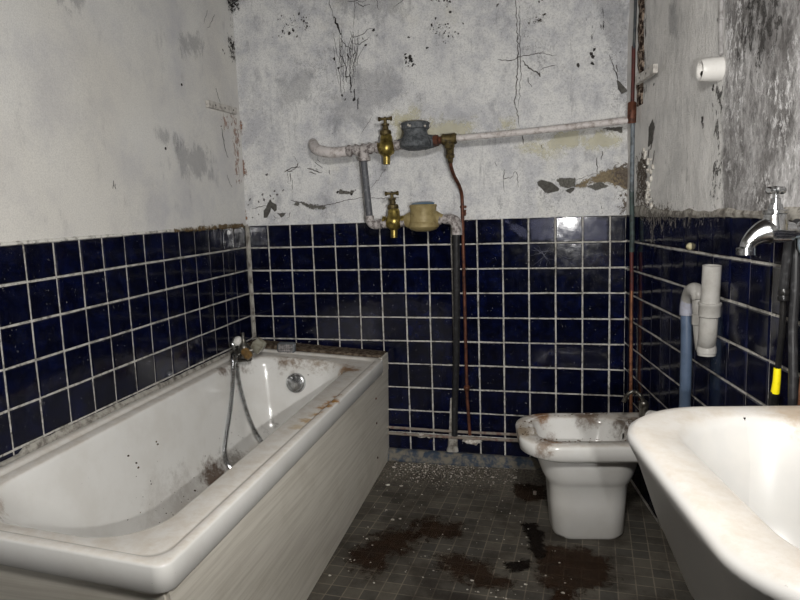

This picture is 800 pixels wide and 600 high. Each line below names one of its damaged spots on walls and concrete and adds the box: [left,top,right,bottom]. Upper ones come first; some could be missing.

damp [736,0,783,77]
crack [498,0,555,144]
spalling [248,189,326,218]
spalling [537,178,576,193]
damp [503,523,548,573]